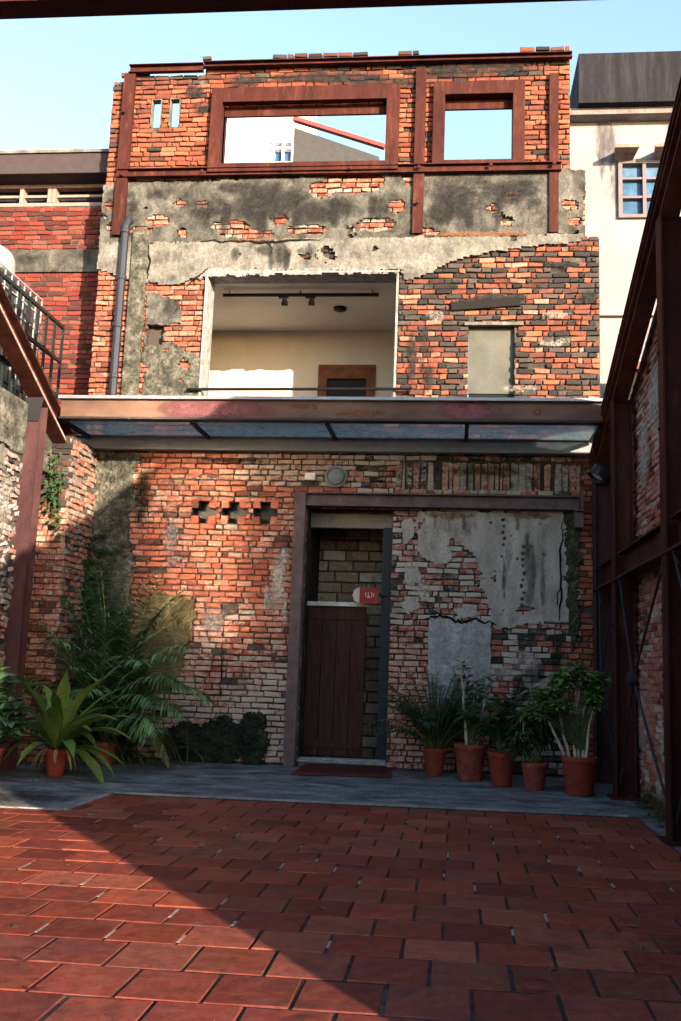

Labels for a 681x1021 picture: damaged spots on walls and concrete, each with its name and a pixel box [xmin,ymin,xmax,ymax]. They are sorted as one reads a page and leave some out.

spalling [309,175,385,199]
spalling [130,215,170,234]
damp [222,204,231,232]
spalling [211,215,327,239]
damp [257,212,291,270]
damp [332,198,340,226]
spalling [347,200,405,233]
peeling [198,266,400,281]
peeling [141,290,201,396]
peeling [401,510,569,630]